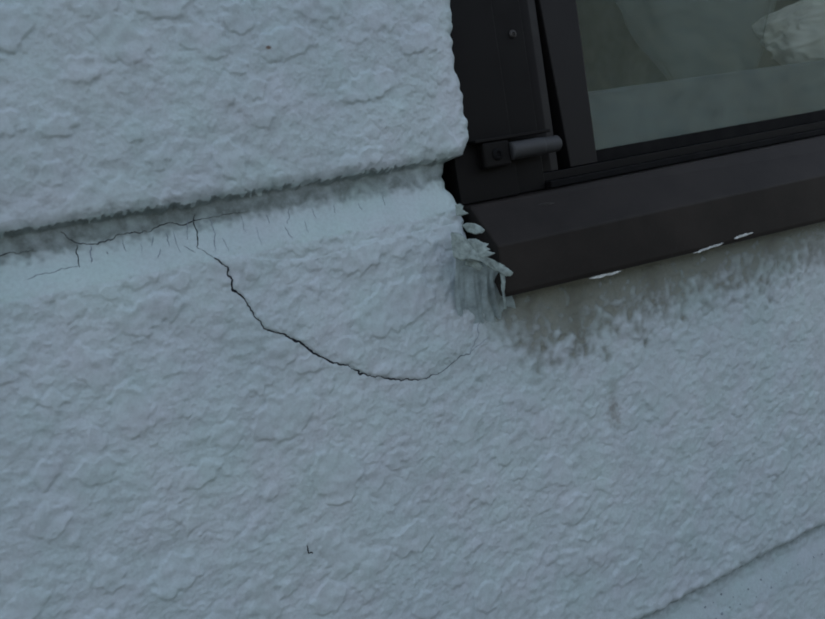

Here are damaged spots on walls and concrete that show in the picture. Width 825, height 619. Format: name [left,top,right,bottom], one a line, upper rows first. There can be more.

crack [29,206,486,381]
peeling [450,204,516,324]